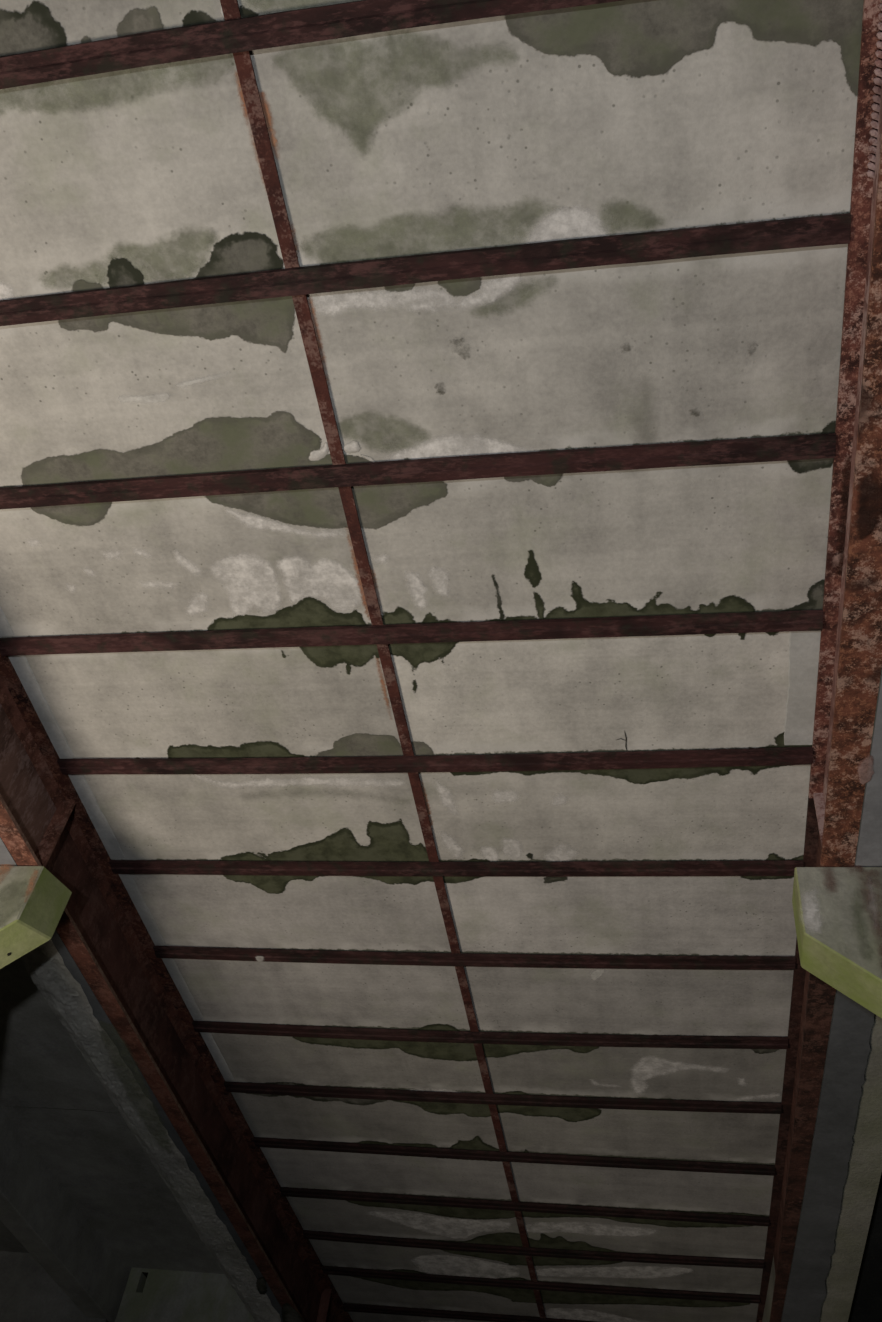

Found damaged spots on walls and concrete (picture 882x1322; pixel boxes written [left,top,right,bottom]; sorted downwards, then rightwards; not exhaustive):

damp [248,0,322,11]
damp [298,33,449,149]
flaking render [309,441,375,462]